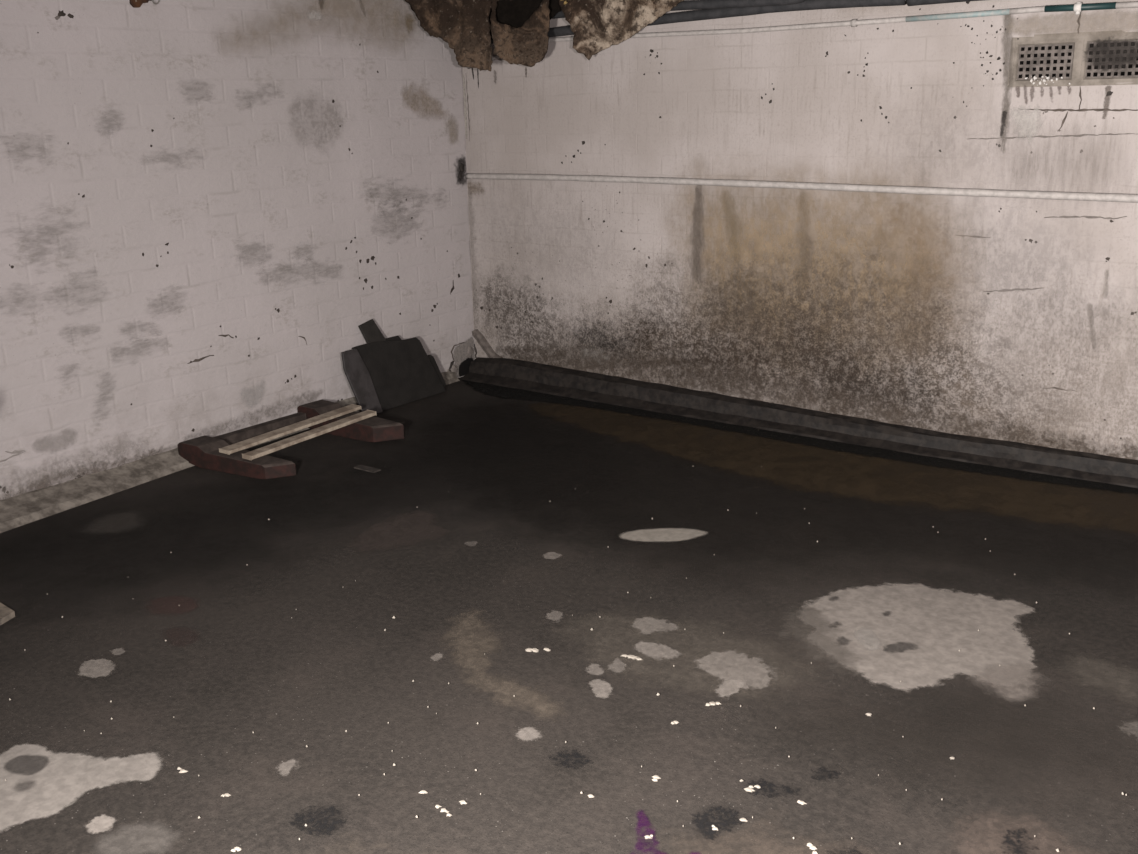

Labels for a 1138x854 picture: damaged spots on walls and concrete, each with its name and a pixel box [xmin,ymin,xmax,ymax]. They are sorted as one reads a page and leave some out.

water stain [1103,86,1113,119]
water stain [480,188,1030,441]
water stain [461,377,1138,565]